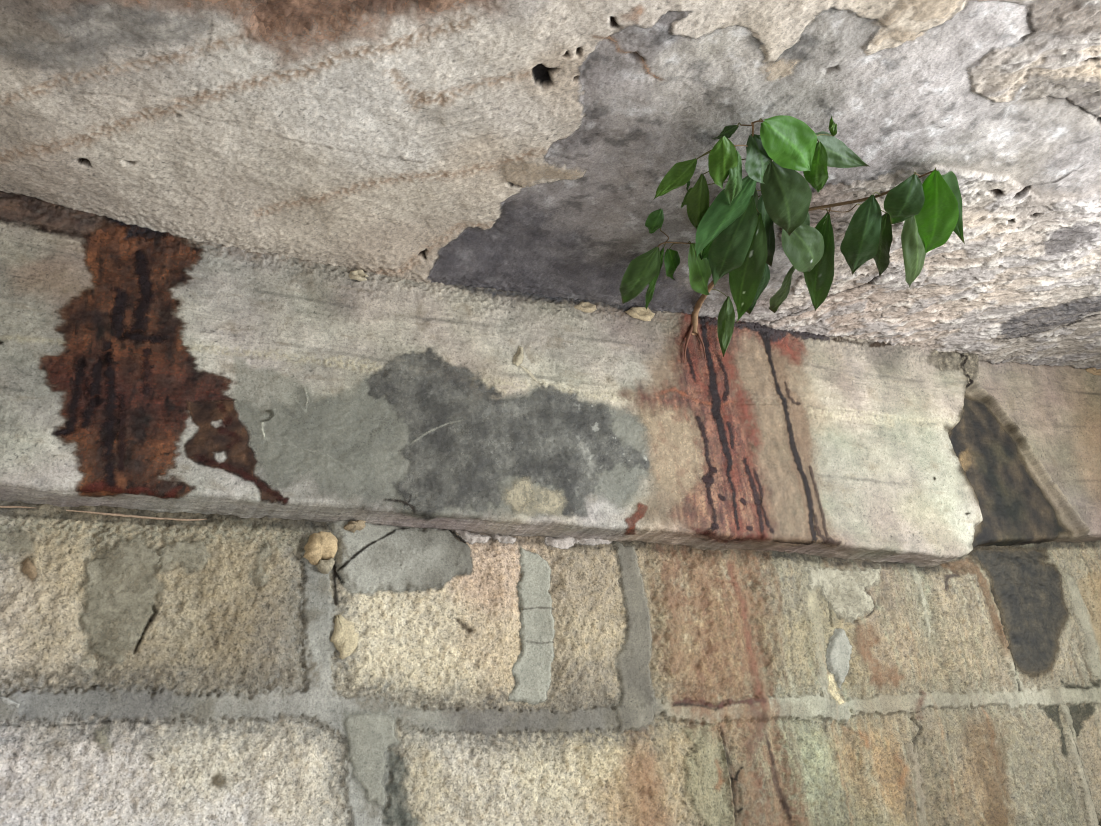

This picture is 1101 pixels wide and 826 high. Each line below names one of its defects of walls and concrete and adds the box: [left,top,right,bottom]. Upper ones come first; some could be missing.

peeling [418,0,1101,321]
rust [40,218,289,505]
leakage [234,316,722,544]
leakage [545,536,611,549]
rust [625,504,647,535]
rust [640,313,774,542]
leakage [719,322,841,547]
leakage [941,392,1072,677]
peeling [1002,296,1101,339]
rust [673,566,766,752]